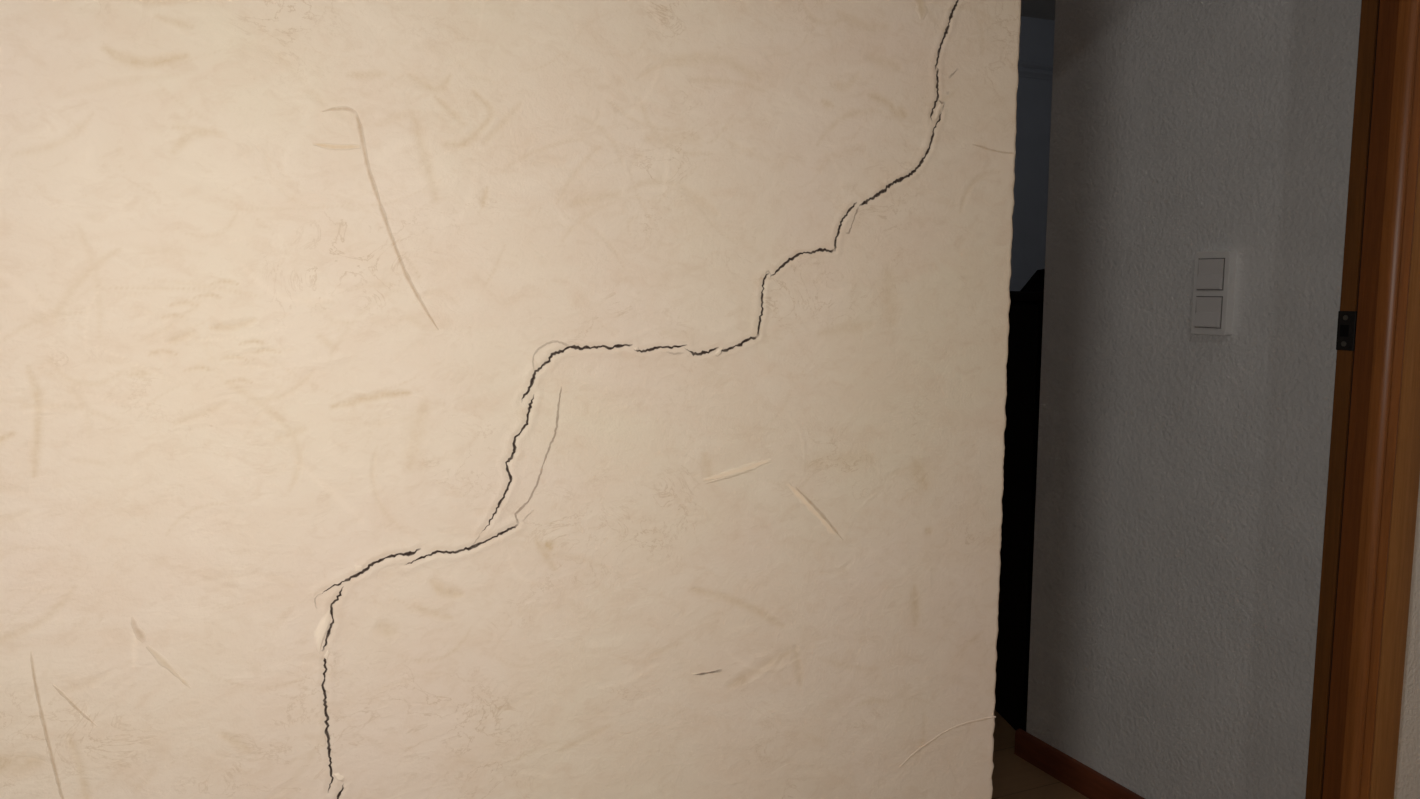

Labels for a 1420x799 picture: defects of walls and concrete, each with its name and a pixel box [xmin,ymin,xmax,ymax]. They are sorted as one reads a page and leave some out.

crack [314,0,959,799]